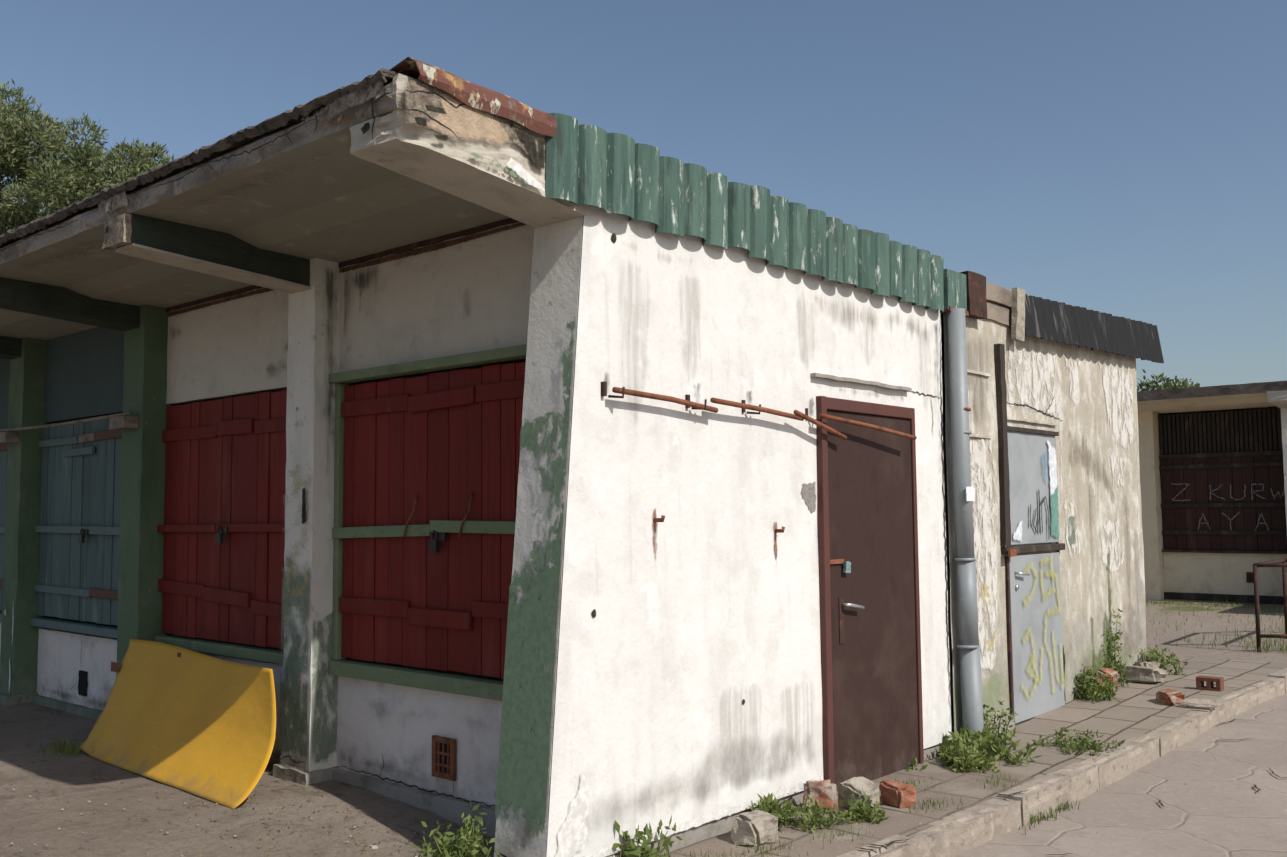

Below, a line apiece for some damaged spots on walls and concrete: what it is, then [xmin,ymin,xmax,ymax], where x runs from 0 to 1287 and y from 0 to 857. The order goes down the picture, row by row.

crack [371,87,392,140]
leakage [327,270,372,332]
peeling [1007,345,1080,416]
peeling [1070,361,1133,496]
peeling [279,465,338,770]
peeling [495,317,575,838]
peeling [1064,494,1130,578]